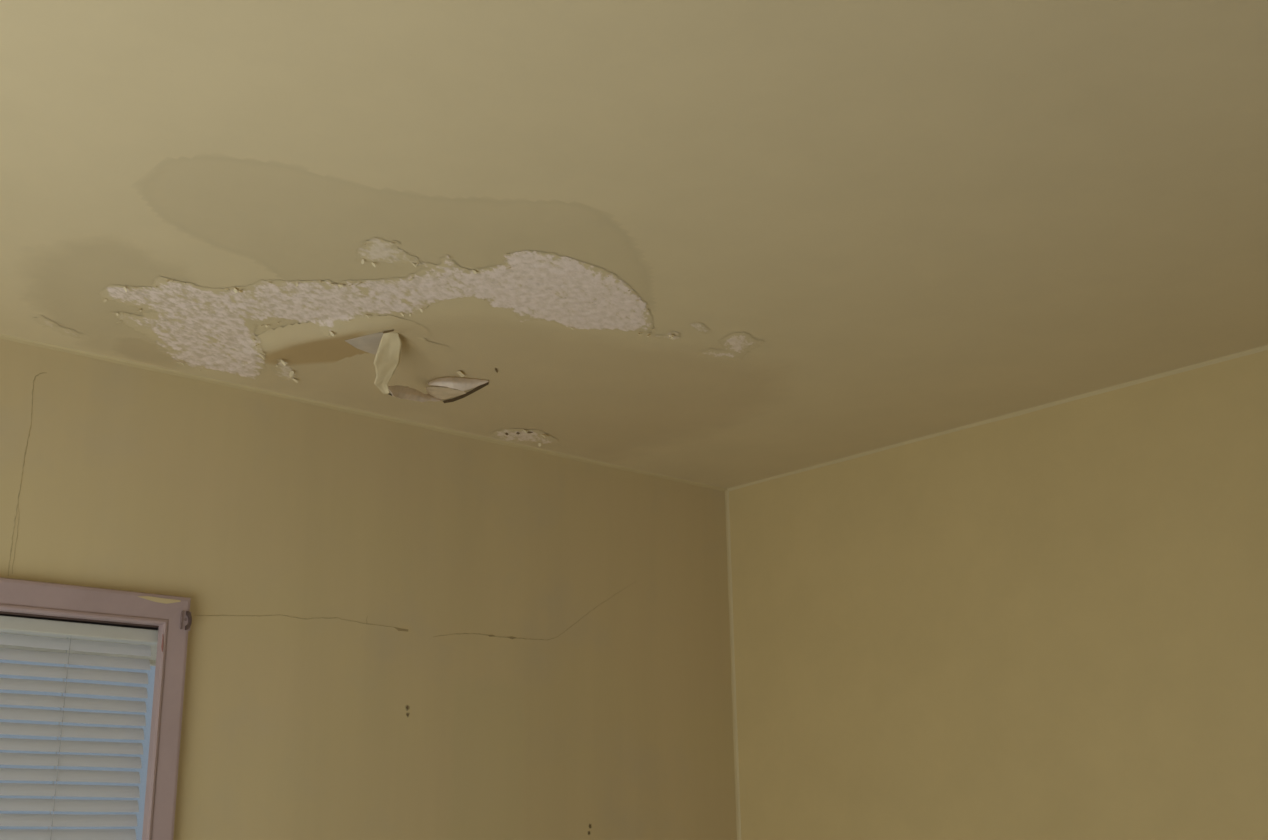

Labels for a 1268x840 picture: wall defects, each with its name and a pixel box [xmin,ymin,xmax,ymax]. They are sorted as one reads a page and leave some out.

peeling [98,237,654,383]
crack [8,372,45,576]
crack [198,582,635,640]